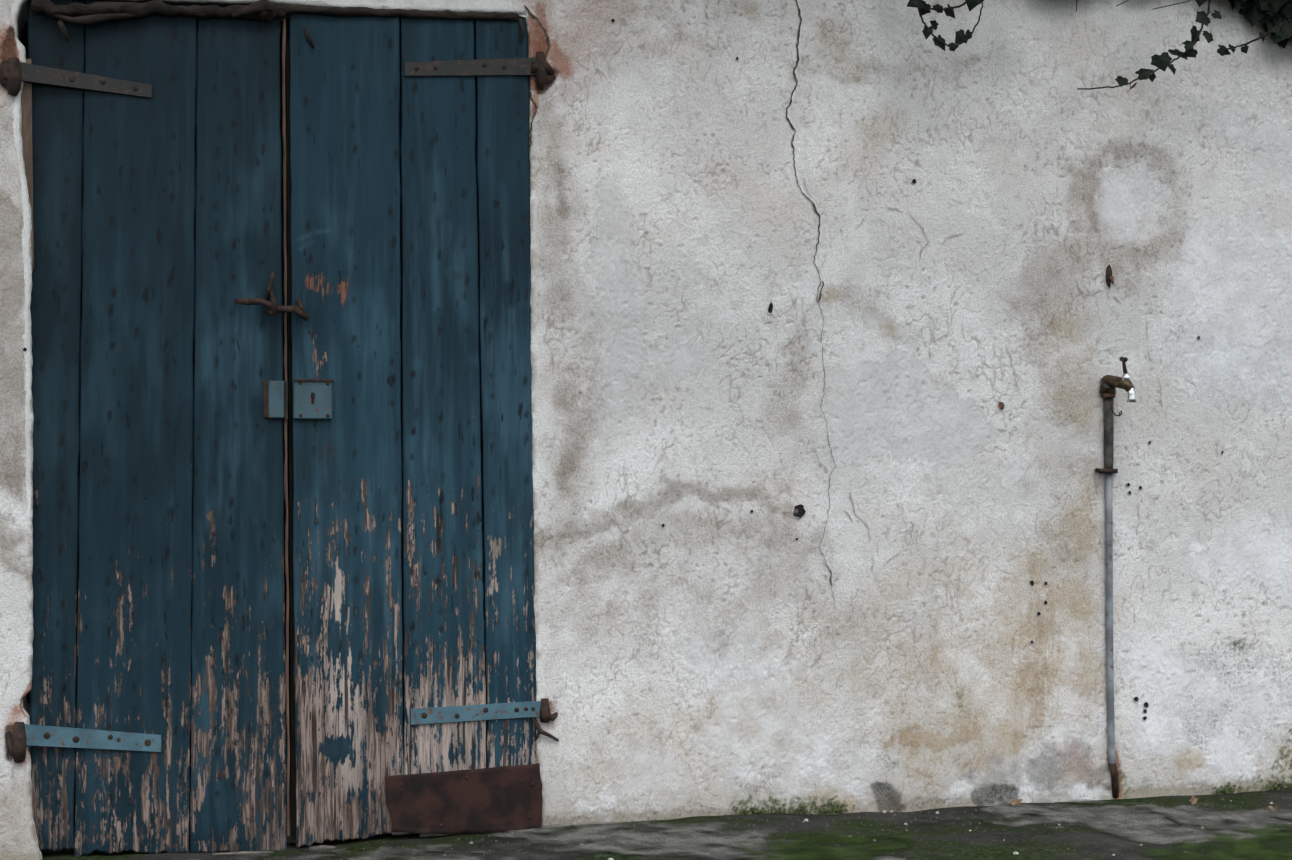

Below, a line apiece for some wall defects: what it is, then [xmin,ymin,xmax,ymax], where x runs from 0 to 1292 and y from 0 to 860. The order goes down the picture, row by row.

rust [528,3,570,94]
crack [774,0,914,671]